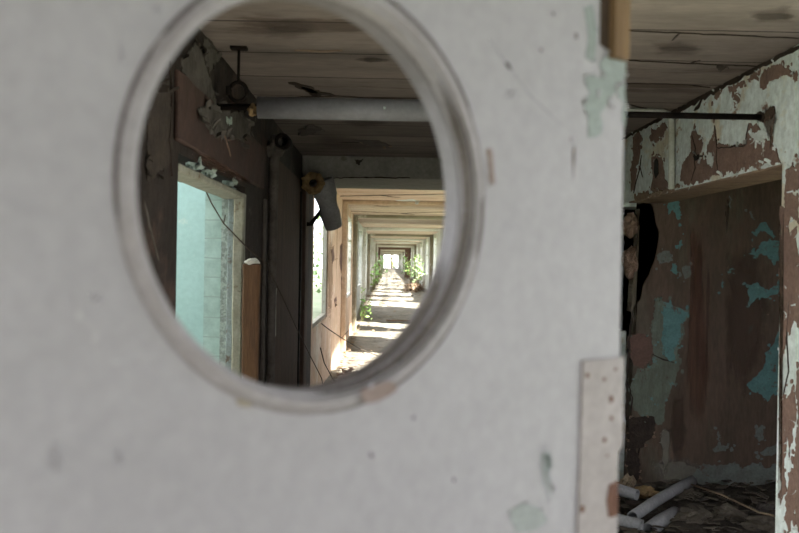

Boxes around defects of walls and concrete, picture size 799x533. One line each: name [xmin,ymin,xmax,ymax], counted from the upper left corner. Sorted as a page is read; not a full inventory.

peeling [181,37,255,149]
peeling [582,4,799,533]